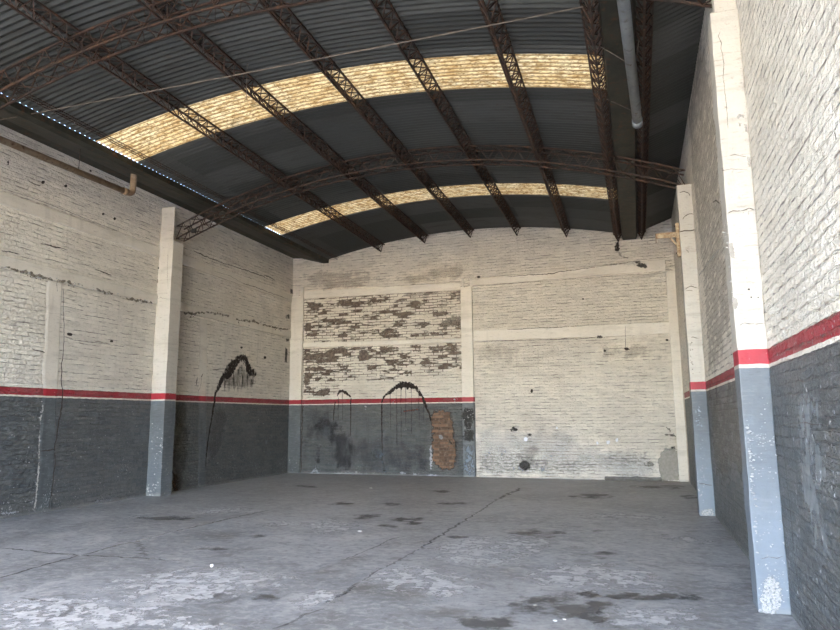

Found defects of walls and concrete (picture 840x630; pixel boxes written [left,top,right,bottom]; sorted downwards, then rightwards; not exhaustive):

peeling [303,286,462,396]
crack [33,339,124,507]
flaking render [429,408,476,475]